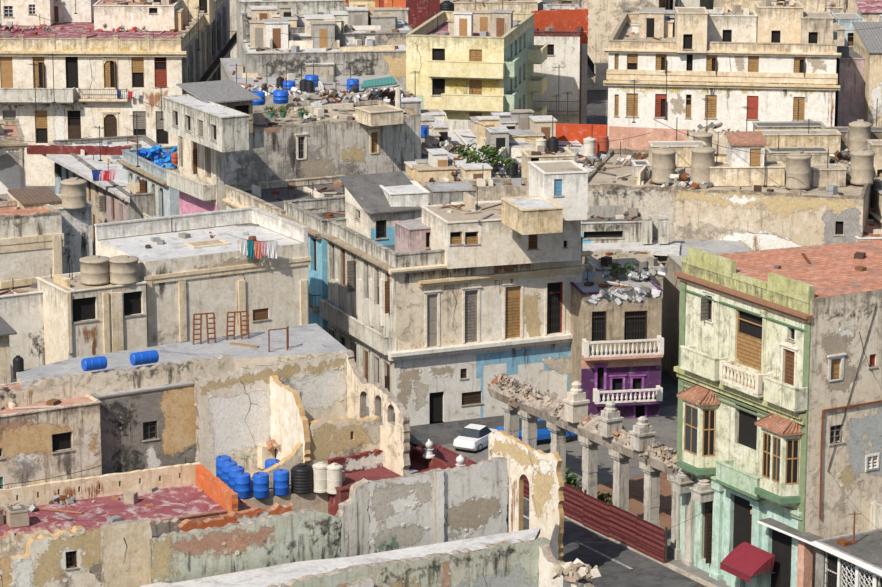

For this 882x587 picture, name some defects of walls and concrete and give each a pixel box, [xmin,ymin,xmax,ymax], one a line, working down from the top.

spalling [0,418,76,458]
peeling [145,356,347,469]
peeling [396,365,454,411]
peeling [837,408,882,491]
peeling [370,481,432,549]
peeling [445,496,501,539]
peeling [0,527,101,587]